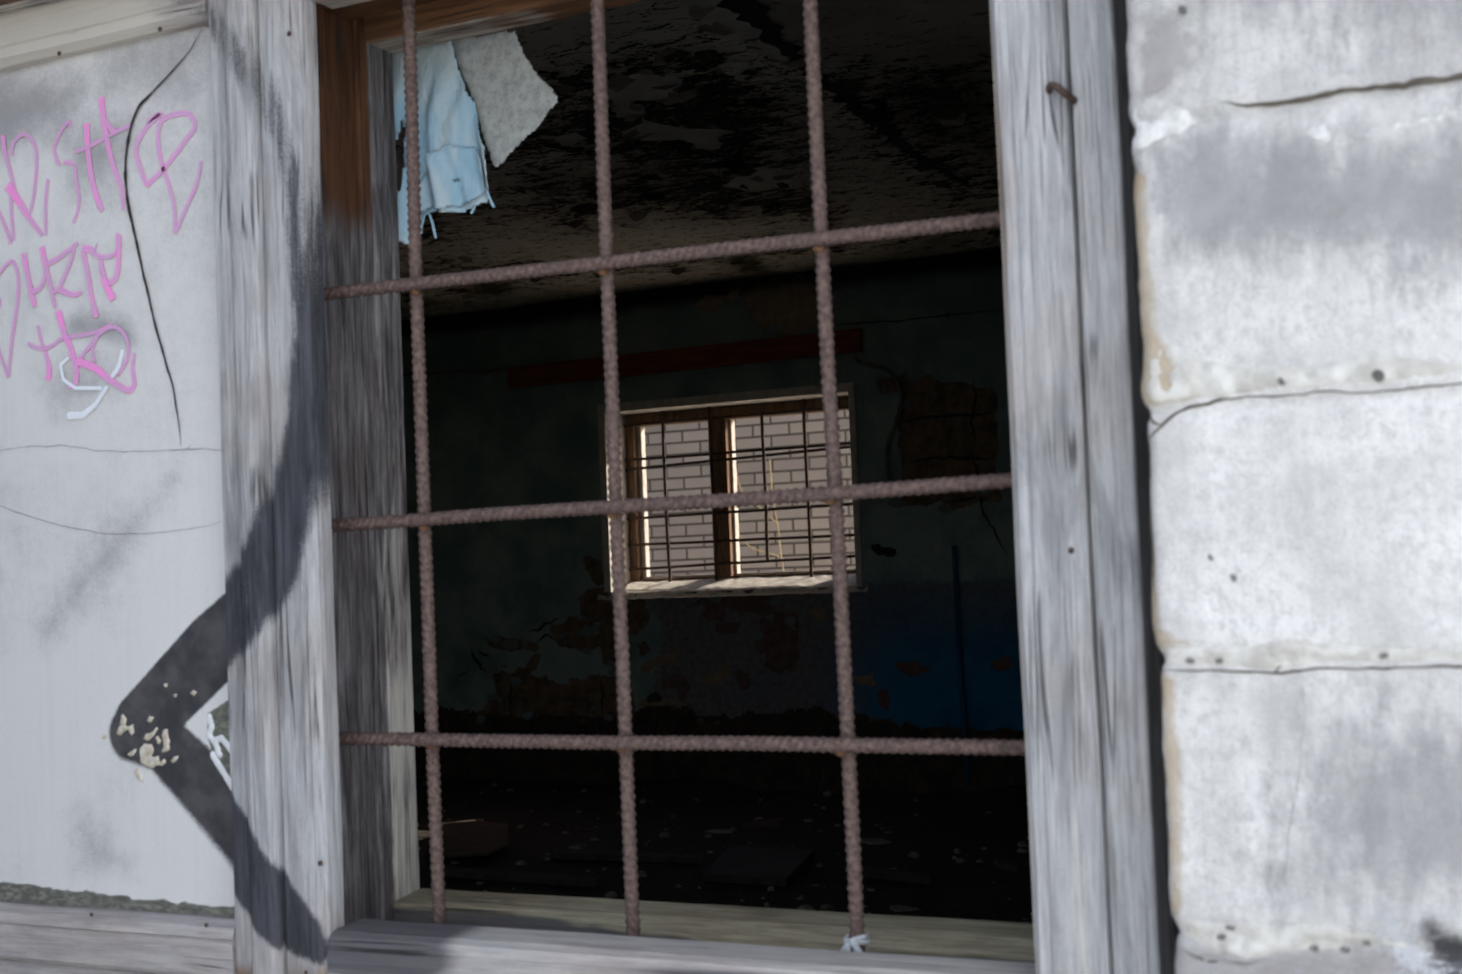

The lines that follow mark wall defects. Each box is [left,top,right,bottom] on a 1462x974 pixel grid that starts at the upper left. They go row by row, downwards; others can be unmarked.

damp [401,247,1002,332]
peeling [876,371,1007,513]
peeling [413,556,1027,794]
damp [1175,953,1401,974]